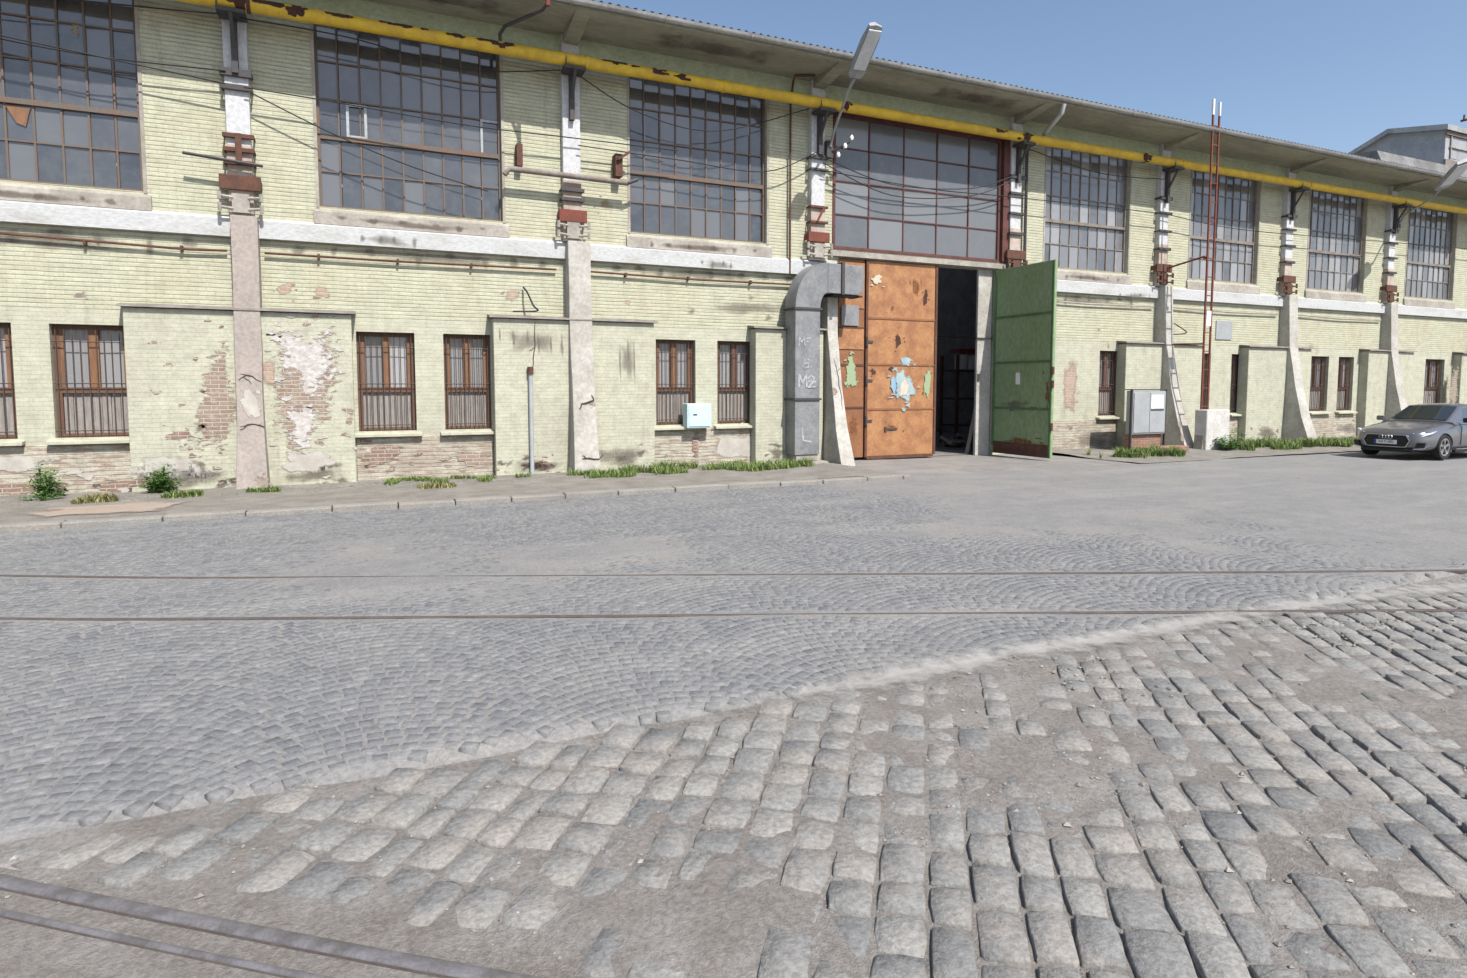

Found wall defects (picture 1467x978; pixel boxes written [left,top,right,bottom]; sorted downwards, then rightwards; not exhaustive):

rust [910,279,930,305]
flaking render [163,282,422,485]
peeling [887,357,932,411]
flaking render [439,450,554,473]
flaking render [0,467,163,495]